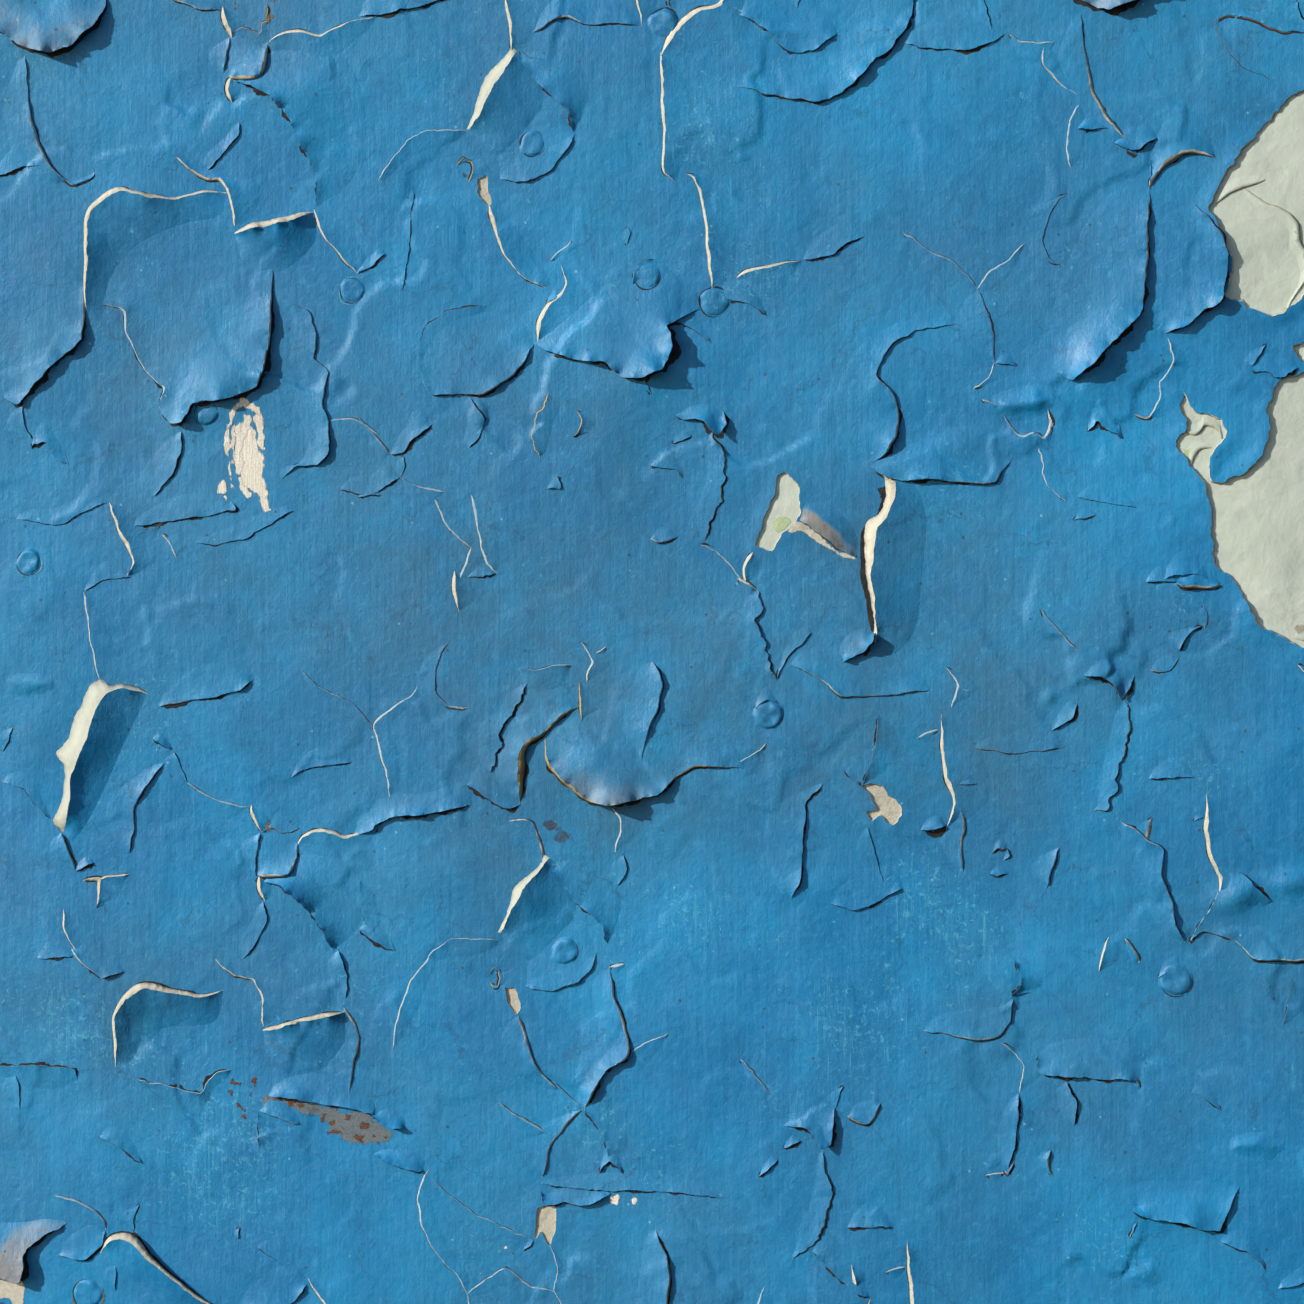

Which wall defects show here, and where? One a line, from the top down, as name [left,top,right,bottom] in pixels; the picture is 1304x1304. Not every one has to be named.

peeling [467,48,589,206]
crack [478,0,864,344]
crack [902,0,1216,520]
peeling [1049,90,1304,381]
crack [7,298,500,680]
peeling [755,319,1012,656]
peeling [1176,342,1304,648]
peeling [53,680,148,841]
crack [257,641,726,1199]
crack [650,429,1079,911]
crack [1092,699,1272,979]
corrosion [228,1077,392,1145]